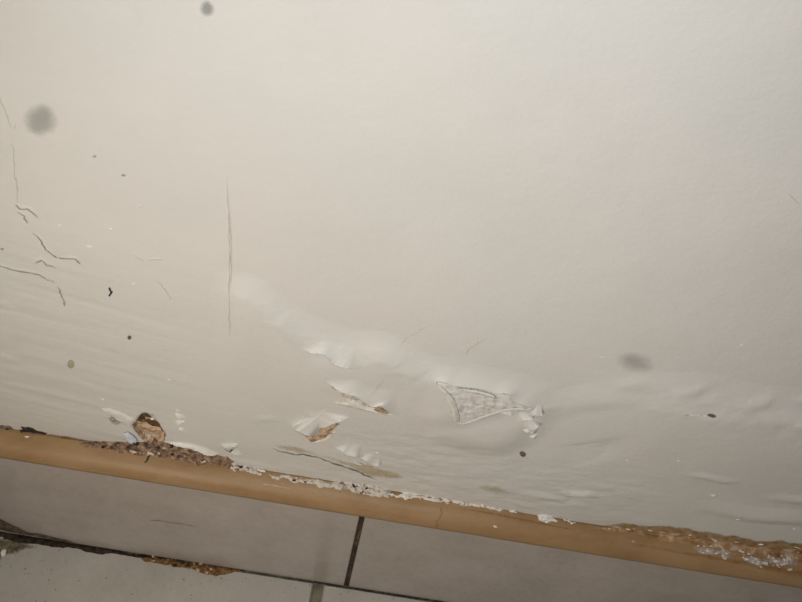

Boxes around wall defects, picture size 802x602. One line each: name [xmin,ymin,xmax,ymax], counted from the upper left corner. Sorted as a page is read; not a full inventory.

crack [0,92,81,307]
crack [226,179,234,332]
spalling [72,399,517,513]
peeling [302,340,363,369]
peeling [292,379,402,442]
peeling [425,367,543,439]